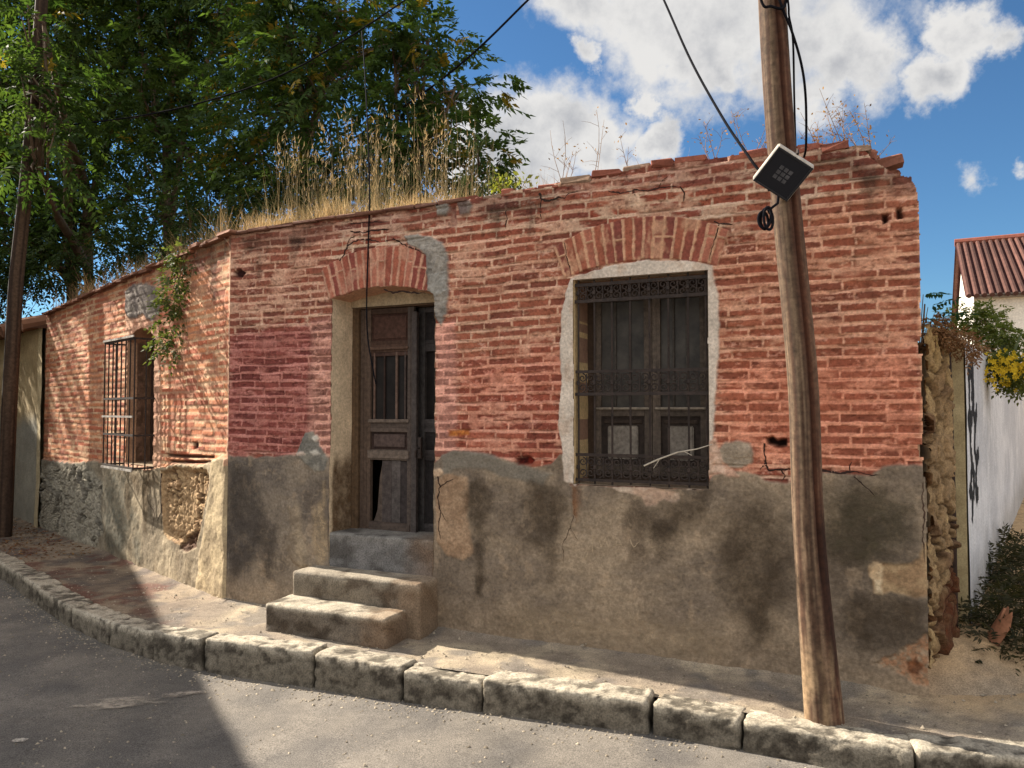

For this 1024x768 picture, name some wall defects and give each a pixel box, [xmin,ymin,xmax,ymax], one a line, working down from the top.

crack [539,191,577,219]
crack [609,177,685,201]
crack [339,221,424,261]
crack [384,287,420,295]
crack [760,443,790,481]
crack [822,462,875,495]
flaking render [160,464,210,552]
crack [437,476,453,539]
water stain [722,510,783,633]